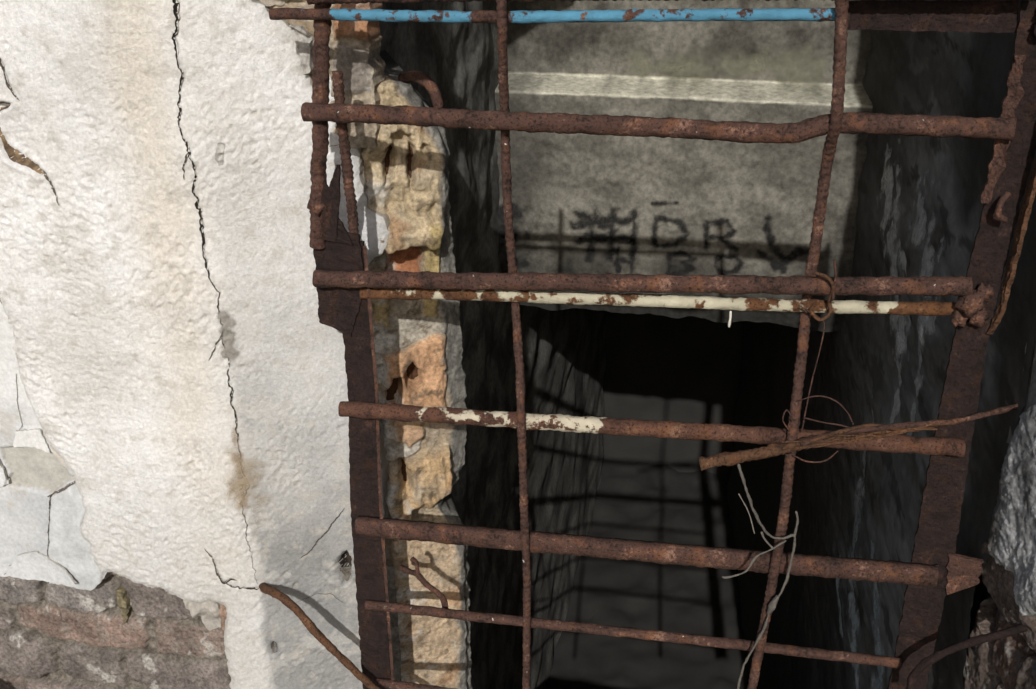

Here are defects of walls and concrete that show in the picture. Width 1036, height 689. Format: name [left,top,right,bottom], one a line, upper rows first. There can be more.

flaking render [258,0,314,83]
flaking render [329,2,386,105]
flaking render [331,122,392,175]
crack [171,0,259,590]
spalling [386,362,418,401]
flaking render [0,302,231,689]
flaking render [338,550,352,581]
flaking render [386,565,402,681]